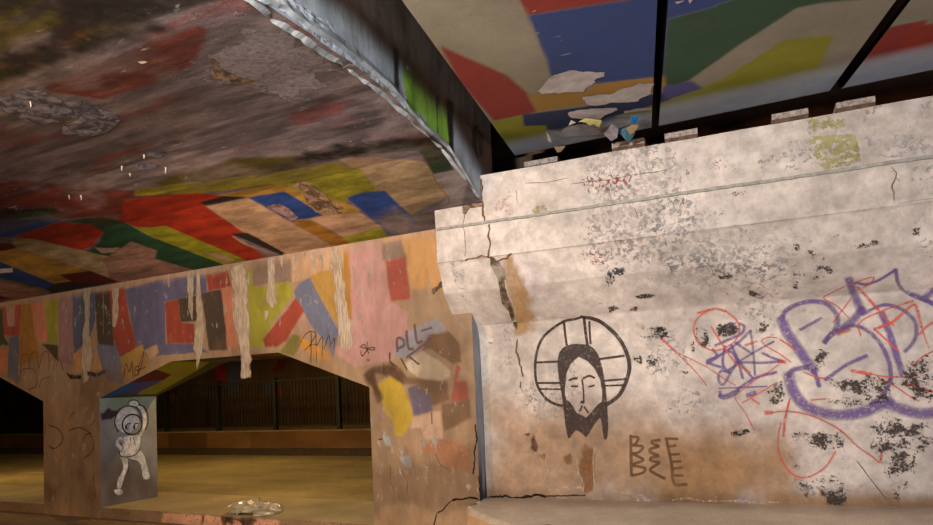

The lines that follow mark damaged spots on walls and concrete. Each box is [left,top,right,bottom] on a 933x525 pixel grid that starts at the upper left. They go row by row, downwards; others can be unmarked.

spalling [0,88,120,137]
peeling [190,0,482,216]
peeling [538,70,654,139]
spalling [268,204,298,220]
spalling [66,369,106,379]
crack [433,424,585,525]